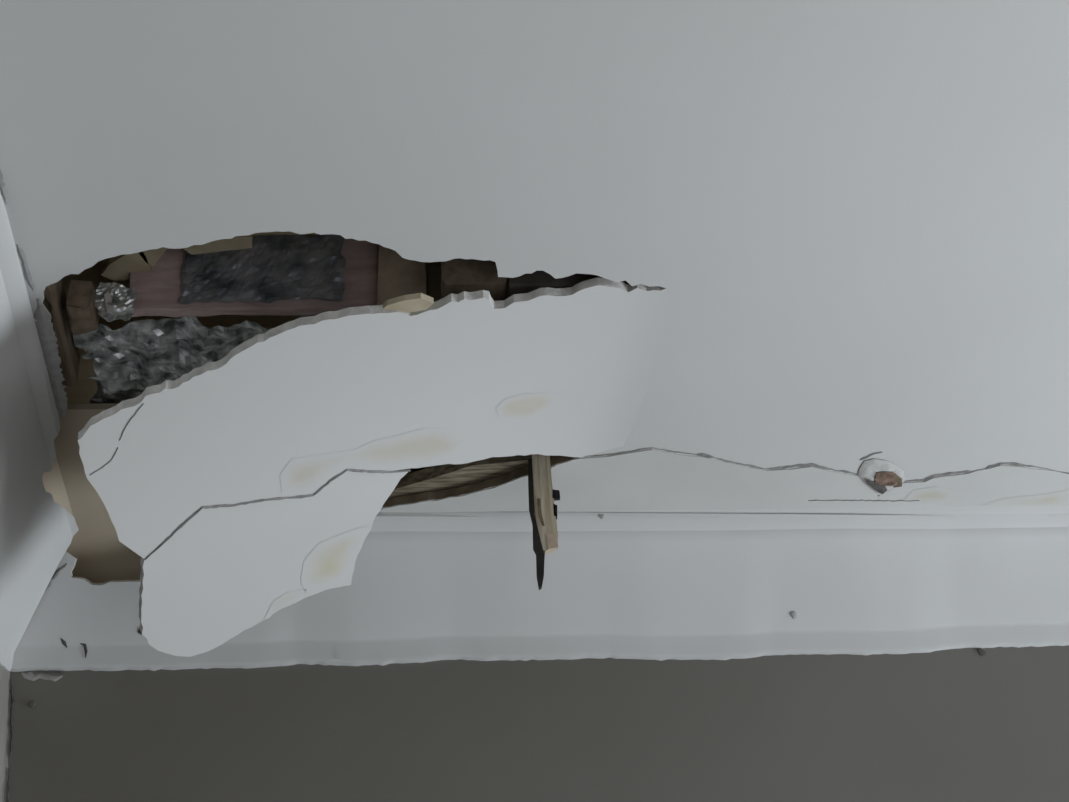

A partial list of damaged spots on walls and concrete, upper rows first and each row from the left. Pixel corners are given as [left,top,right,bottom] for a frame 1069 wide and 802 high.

flaking render [78,277,669,657]
crack [585,447,1069,502]